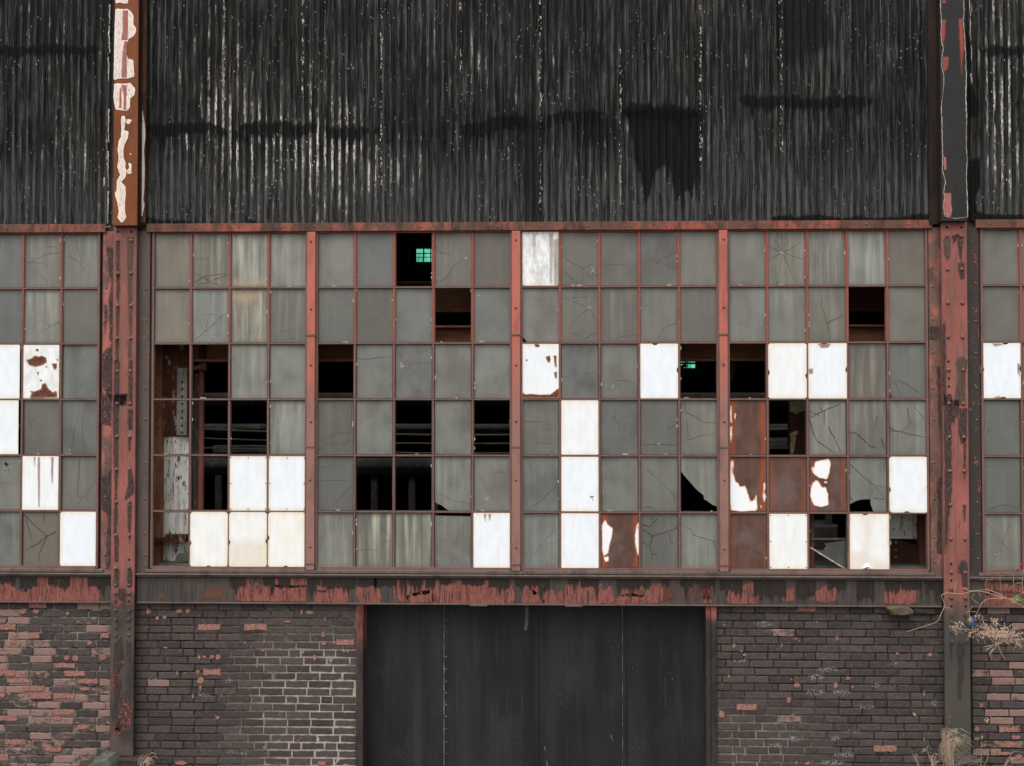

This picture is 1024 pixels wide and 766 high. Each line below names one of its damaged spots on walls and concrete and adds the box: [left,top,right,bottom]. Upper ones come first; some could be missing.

peeling [103,0,145,227]
damp [619,102,703,218]
corrosion [26,349,58,398]
peeling [725,582,762,604]
peeling [782,585,837,623]
peeling [884,585,917,605]